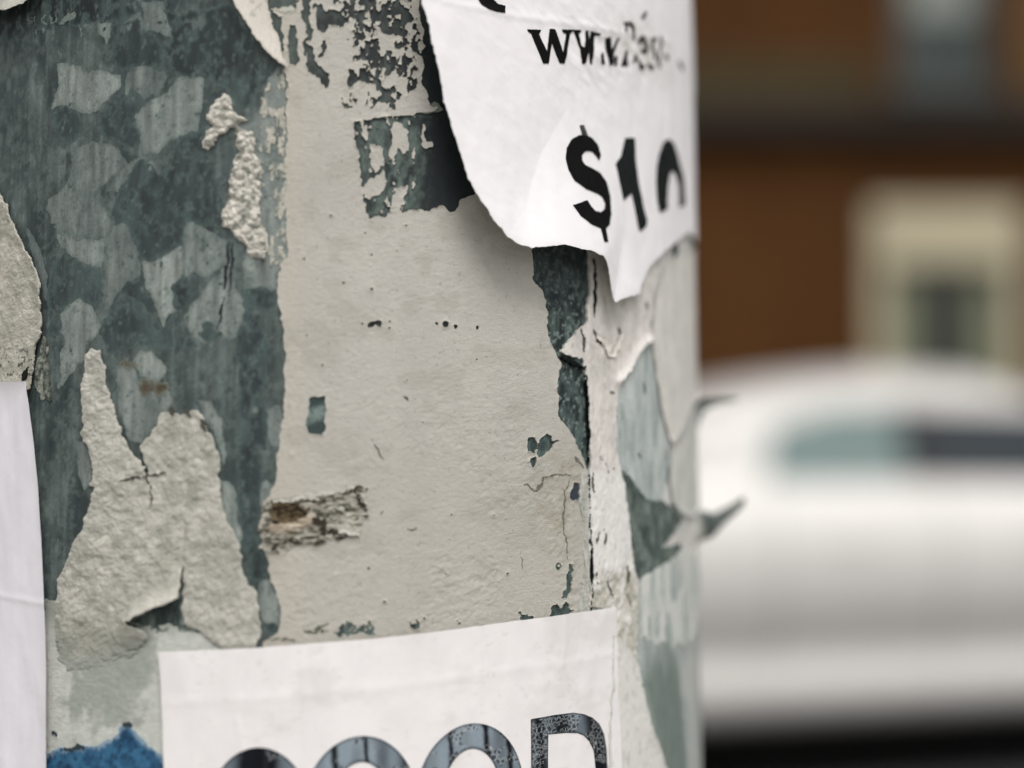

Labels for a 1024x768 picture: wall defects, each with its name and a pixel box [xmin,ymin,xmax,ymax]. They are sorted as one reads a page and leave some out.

peeling [259,0,475,266]
crack [591,258,599,317]
peeling [532,244,589,468]
peeling [54,348,261,671]
peeling [272,494,320,503]
peeling [337,506,360,536]
spalling [527,434,558,468]
crack [524,356,594,611]
spalling [570,482,579,501]
peeling [615,343,682,579]
spalling [550,563,573,617]